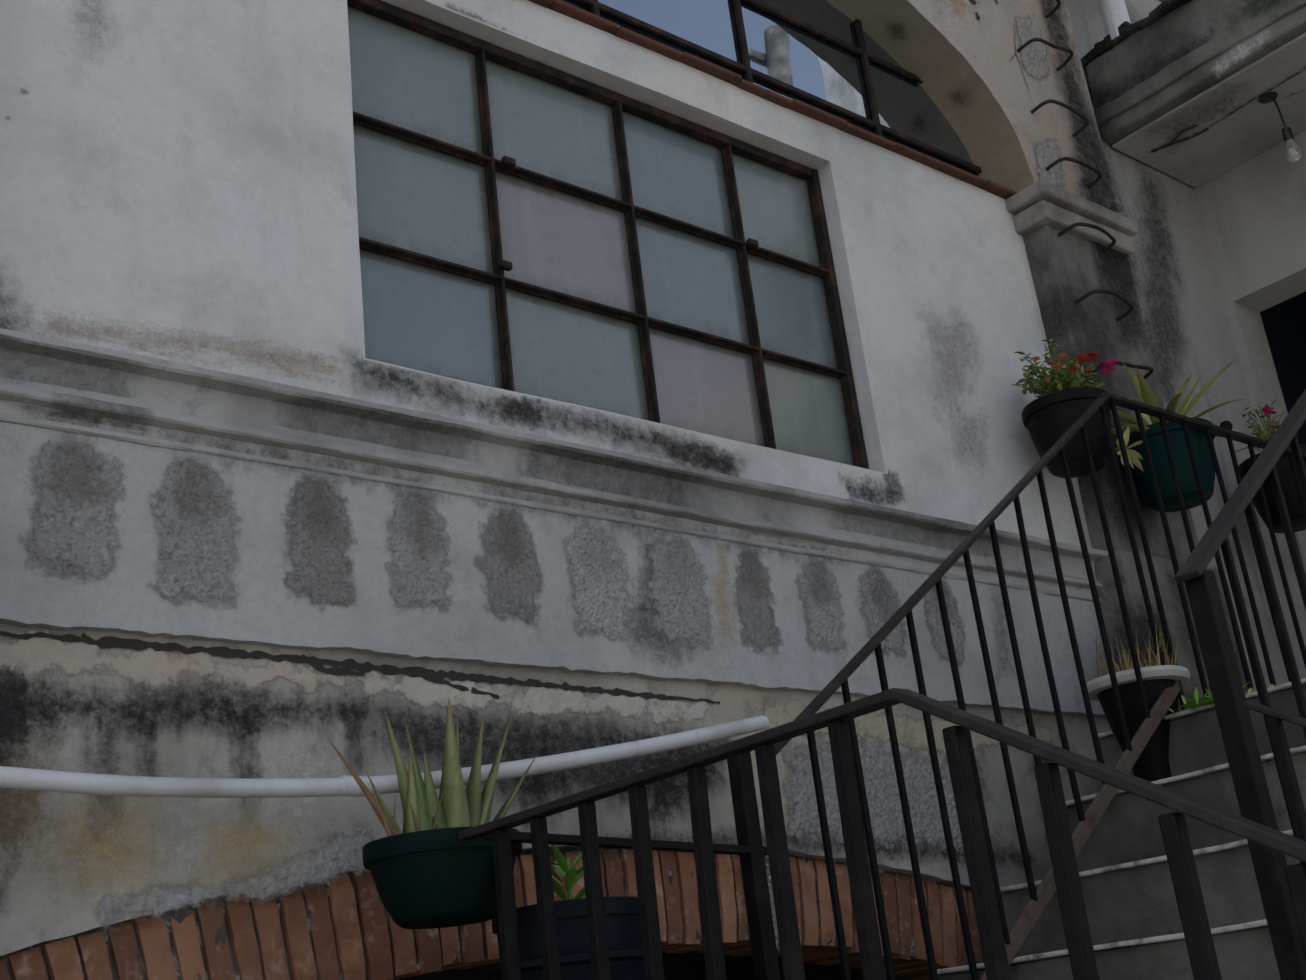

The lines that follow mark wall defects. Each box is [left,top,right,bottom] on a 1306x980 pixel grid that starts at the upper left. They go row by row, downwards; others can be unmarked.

damp [1040,0,1214,212]
damp [1096,180,1183,406]
damp [356,361,734,472]
damp [0,676,364,777]
peeling [0,629,708,725]
damp [382,707,729,821]